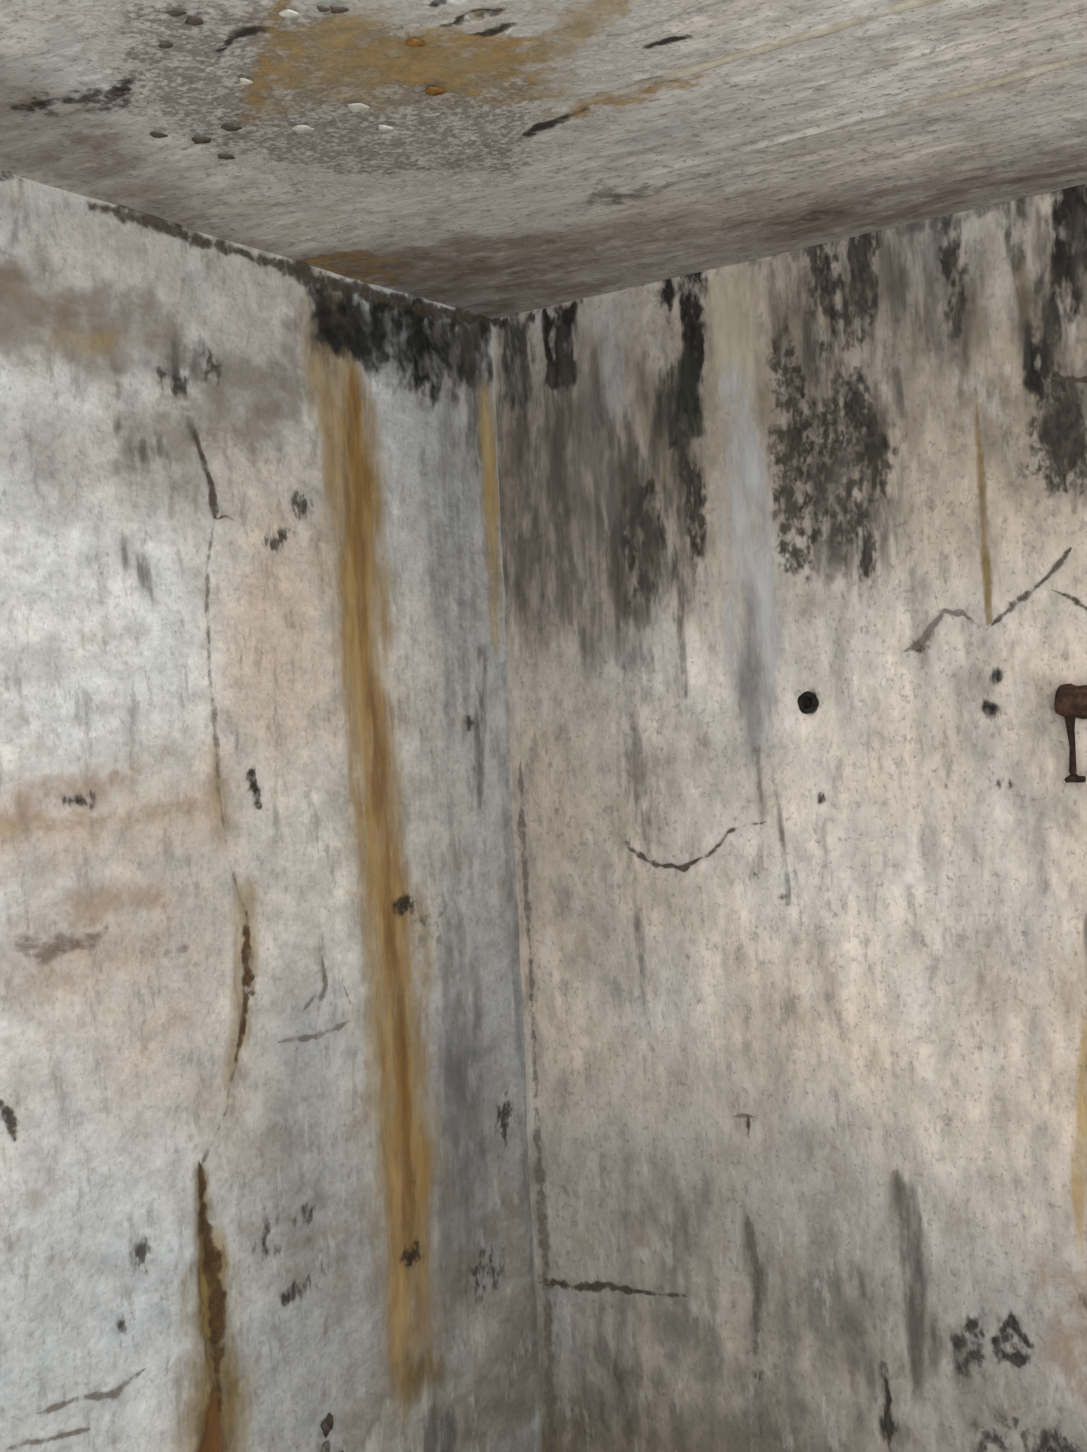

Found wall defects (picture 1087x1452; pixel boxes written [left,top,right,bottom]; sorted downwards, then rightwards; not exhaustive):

corrosion [248,0,547,104]
damp [909,215,967,338]
damp [977,198,1025,216]
damp [1005,232,1025,270]
damp [1023,184,1087,491]
damp [311,273,603,614]
damp [587,231,908,683]
crack [904,547,1087,652]
corrosion [309,344,429,1387]
crack [626,822,764,872]
corrosion [198,1162,238,1452]
mould [979,1417,1077,1452]